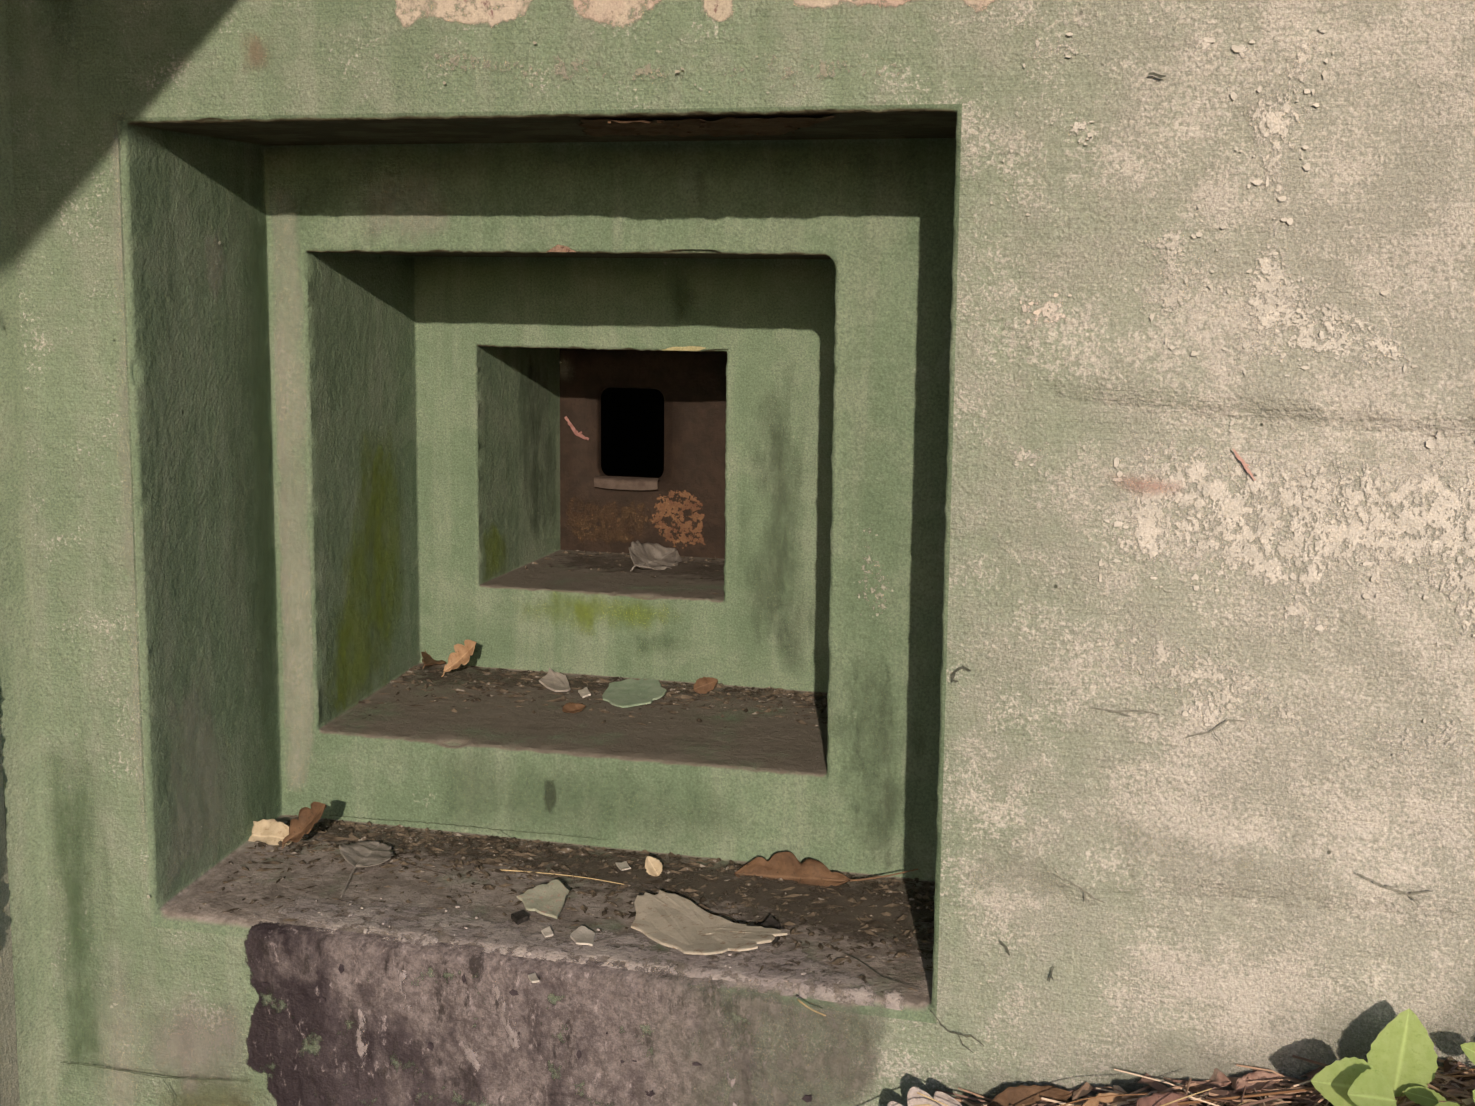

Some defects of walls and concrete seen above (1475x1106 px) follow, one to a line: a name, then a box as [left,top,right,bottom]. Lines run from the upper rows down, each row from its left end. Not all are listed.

peeling [1099,431,1475,653]